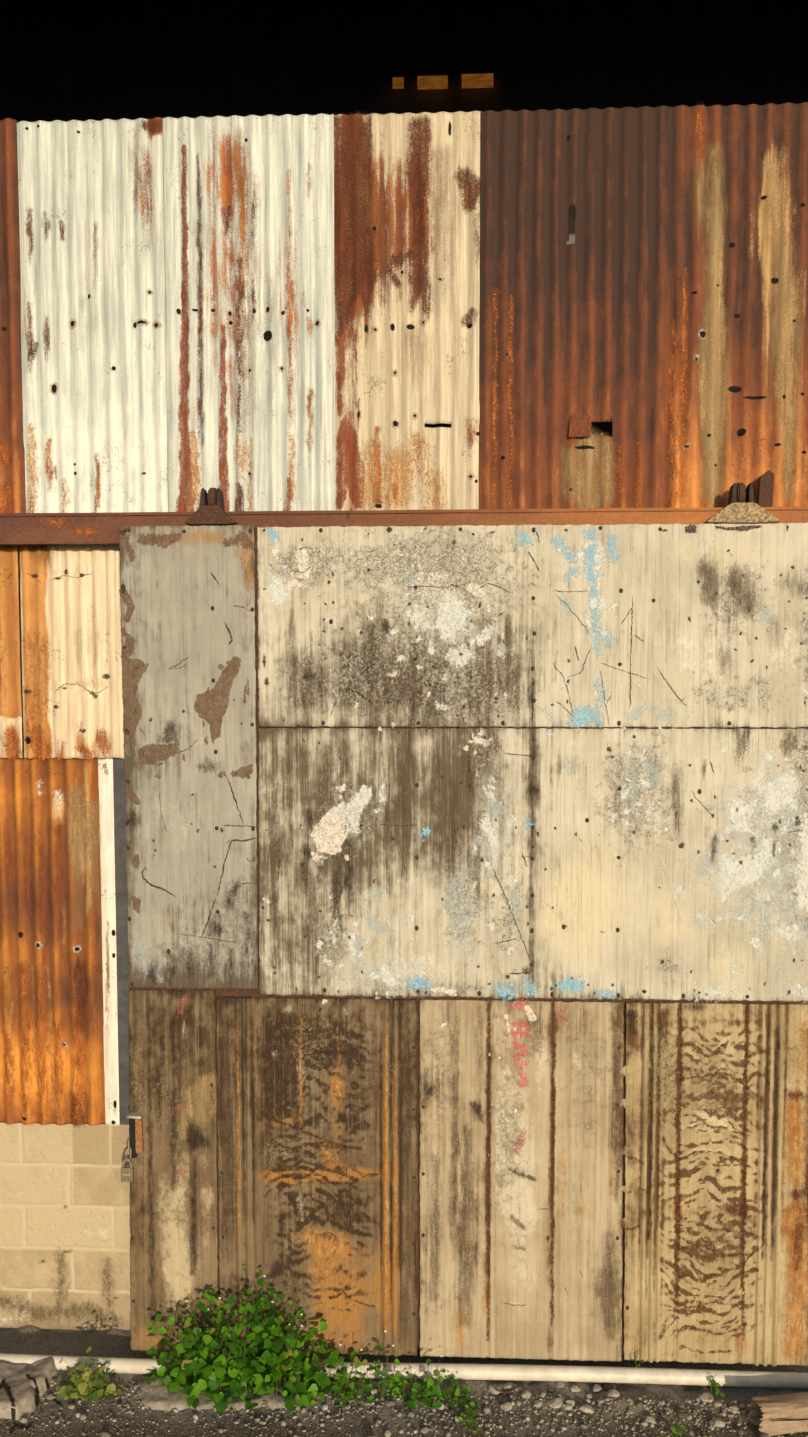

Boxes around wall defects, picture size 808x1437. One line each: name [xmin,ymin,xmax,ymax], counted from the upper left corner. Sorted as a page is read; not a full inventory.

rust [455,167,480,211]
rust [176,145,256,512]
rust [283,179,313,511]
rust [334,114,444,510]
rust [668,106,728,506]
peeling [263,529,318,605]
peeling [182,656,269,745]
peeling [386,578,529,717]
water stain [301,847,342,944]
peeling [299,783,387,867]
peeling [454,721,518,870]
rust [4,960,89,1126]